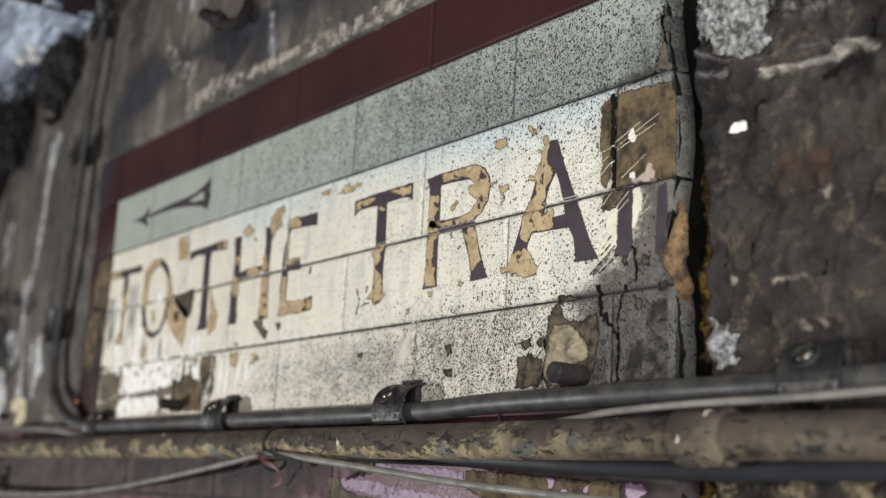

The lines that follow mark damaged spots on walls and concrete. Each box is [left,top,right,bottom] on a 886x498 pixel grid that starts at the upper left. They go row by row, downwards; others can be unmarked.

spalling [696,0,831,60]
peeling [600,12,685,212]
crack [610,0,728,378]
spalling [514,294,600,389]
peeling [327,462,647,498]
crack [682,481,722,498]